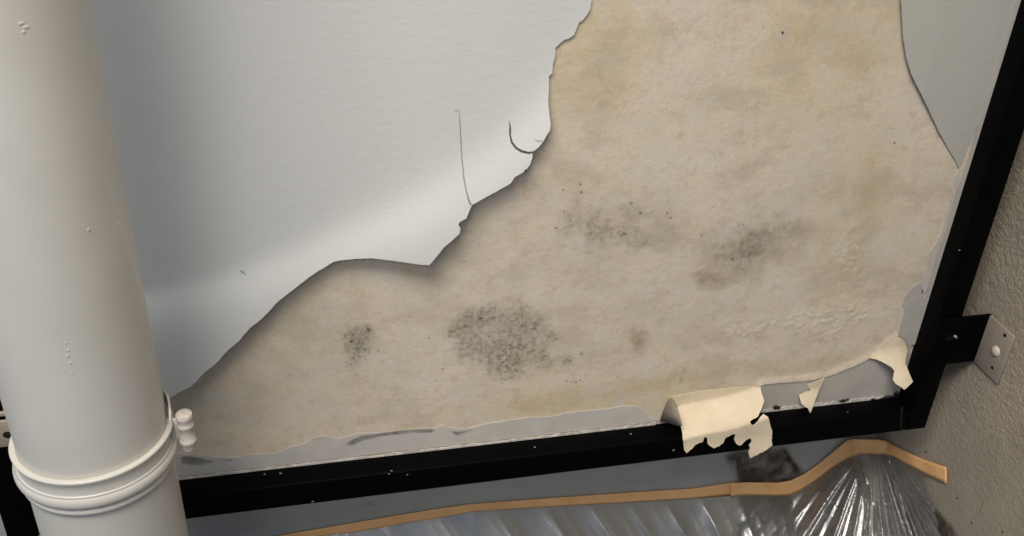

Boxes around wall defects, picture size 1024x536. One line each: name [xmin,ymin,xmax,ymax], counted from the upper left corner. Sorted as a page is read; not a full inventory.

peeling [901,0,1016,168]
peeling [90,0,592,398]
crack [455,110,472,206]
crack [509,122,543,154]
peeling [755,330,911,410]